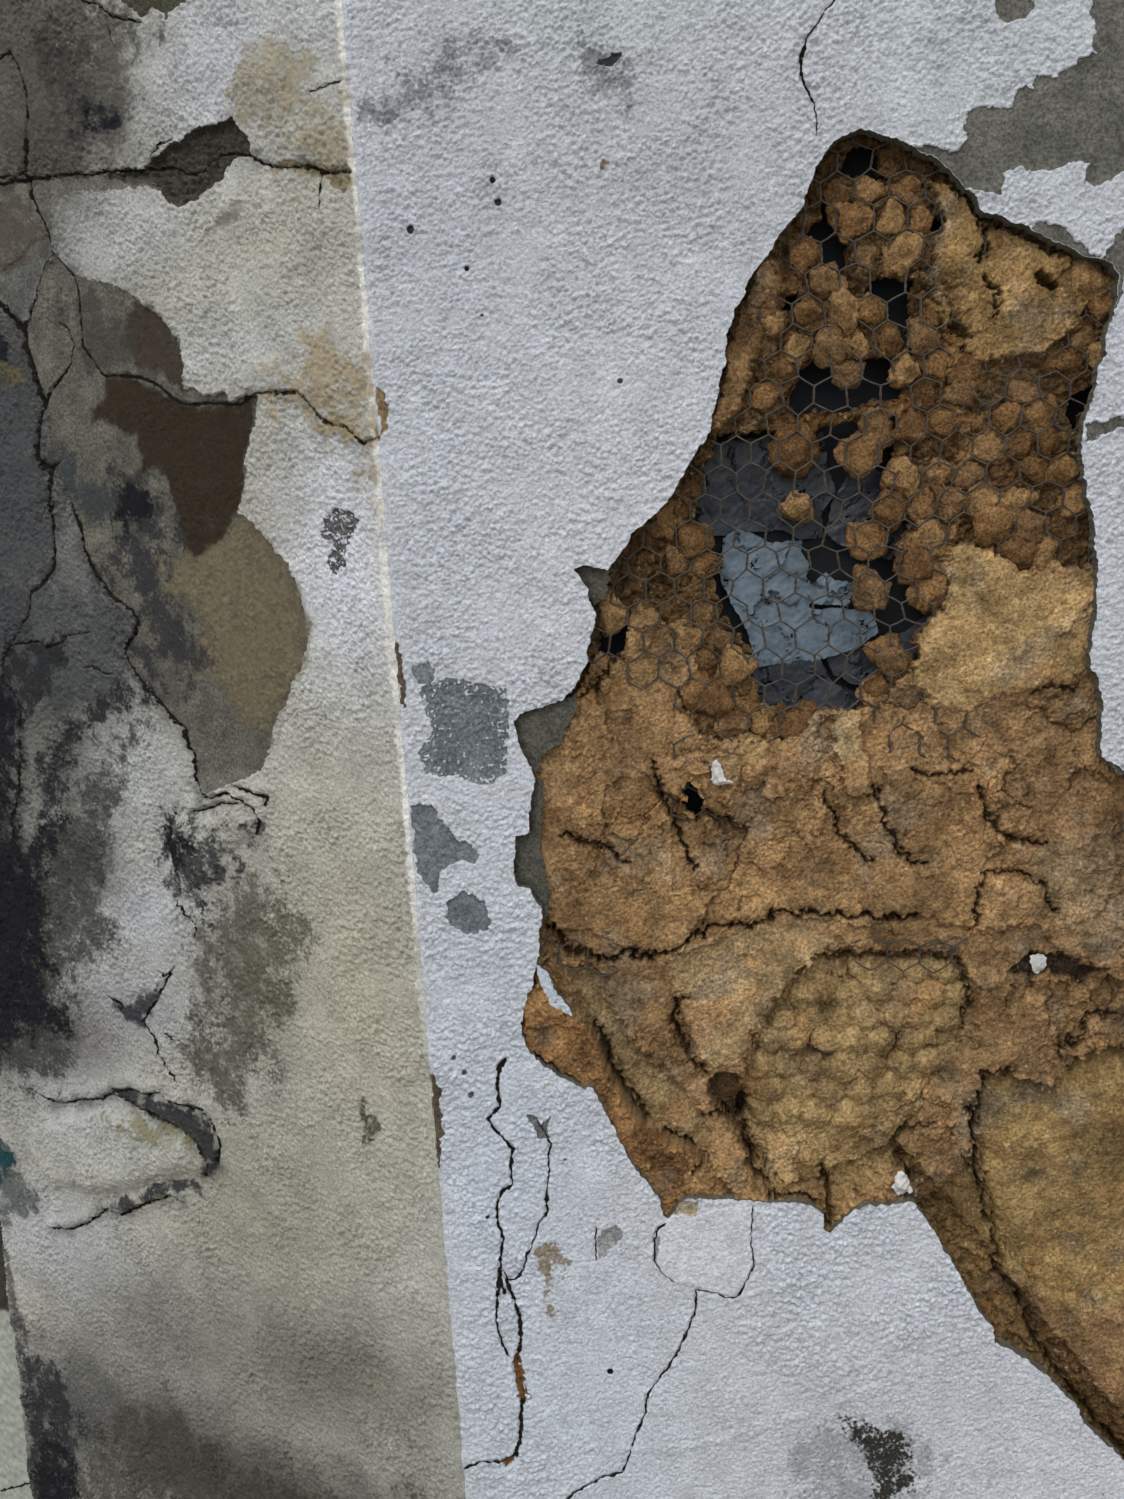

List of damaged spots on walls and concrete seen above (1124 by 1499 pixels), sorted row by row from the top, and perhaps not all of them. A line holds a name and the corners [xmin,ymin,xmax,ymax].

peeling [121,0,186,20]
crack [799,0,835,133]
peeling [0,116,308,794]
water stain [0,287,311,1098]
crack [0,50,379,857]
flaking render [394,0,1124,1460]
crack [464,1058,552,1469]
crack [566,1205,755,1499]